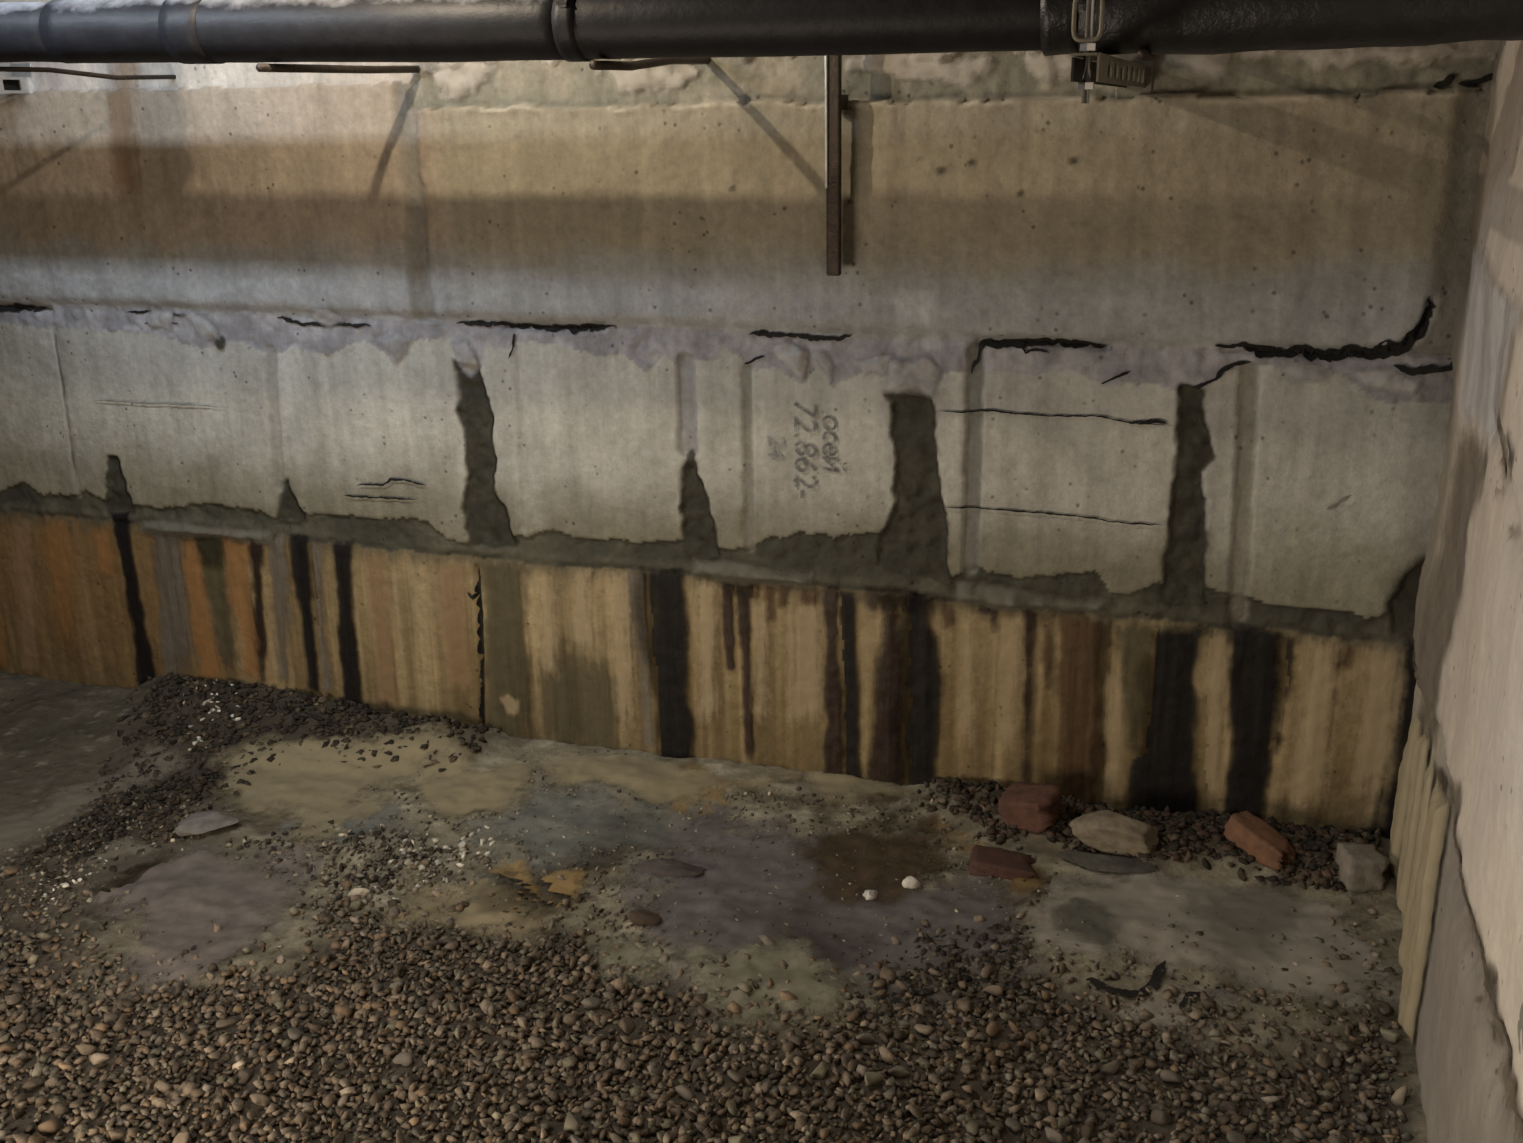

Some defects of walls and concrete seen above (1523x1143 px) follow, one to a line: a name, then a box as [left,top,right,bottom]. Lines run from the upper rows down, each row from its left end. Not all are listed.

spalling [432,62,495,99]
spalling [597,58,698,93]
spalling [845,53,991,87]
spalling [1167,44,1451,79]
crack [1192,296,1453,389]
spalling [454,360,516,546]
spalling [678,450,719,557]
spalling [855,355,951,585]
spalling [1160,384,1213,606]
damp [112,512,234,686]
damp [248,535,361,703]
damp [80,563,1118,999]